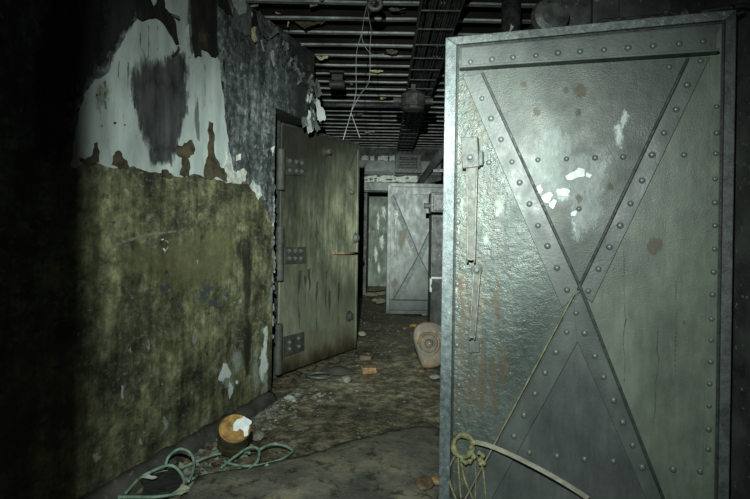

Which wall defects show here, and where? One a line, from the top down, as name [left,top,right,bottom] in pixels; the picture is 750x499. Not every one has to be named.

water stain [167,52,185,93]
water stain [150,146,175,165]
peeling [70,0,326,339]
peeling [528,126,614,242]
peeling [613,109,630,149]
water stain [236,239,252,303]
spalling [218,351,243,399]
water stain [243,319,269,395]